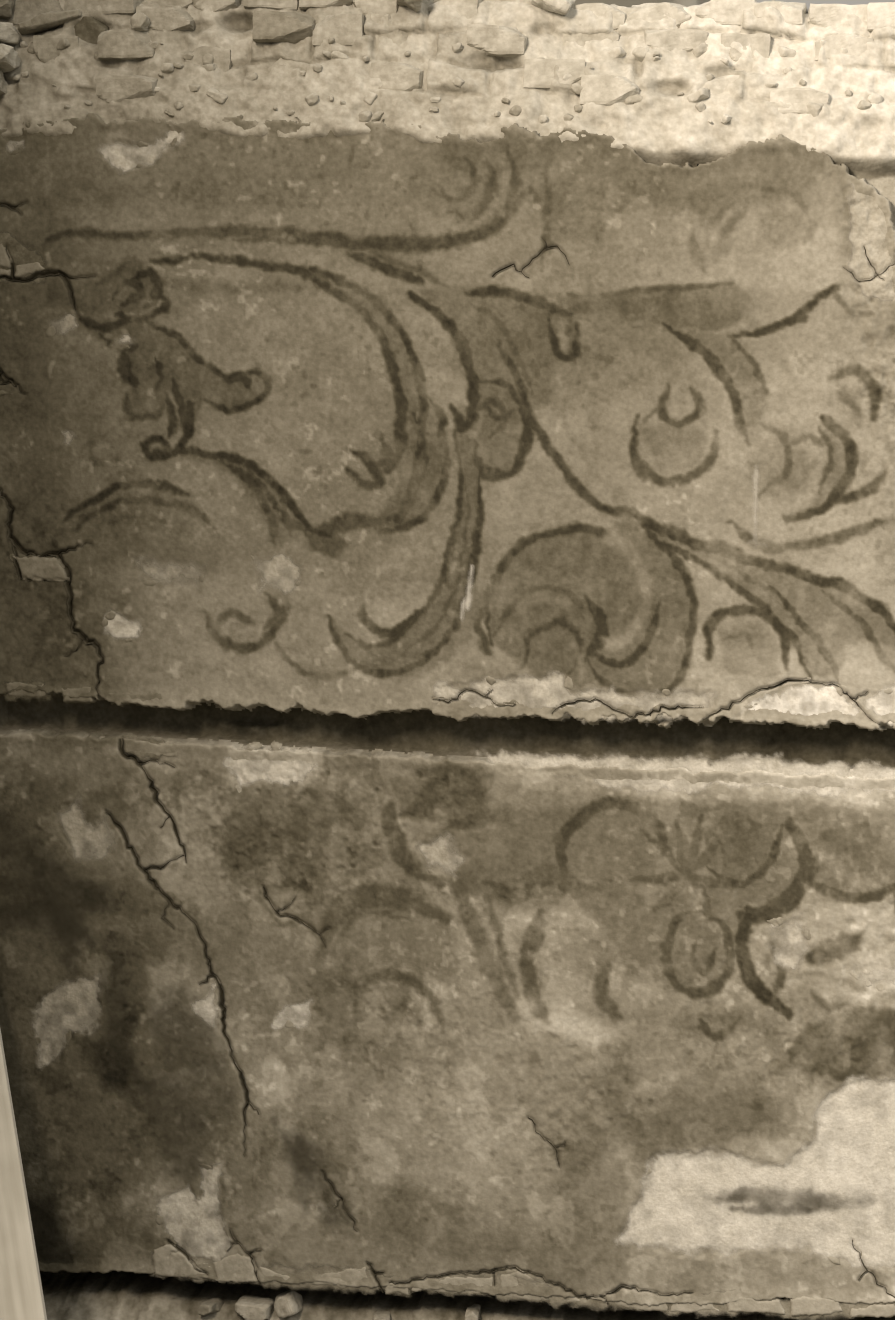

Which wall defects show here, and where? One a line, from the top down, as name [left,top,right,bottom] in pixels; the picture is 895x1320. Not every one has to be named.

peeling [102,131,183,172]
crack [492,241,569,278]
spalling [848,176,895,301]
crack [0,489,103,698]
crack [552,679,880,725]
peeling [744,677,895,730]
peeling [489,751,895,796]
crack [105,738,259,1157]
peeling [767,917,811,969]
peeling [619,1077,895,1267]
damp [28,1200,57,1264]
crack [367,1263,693,1305]